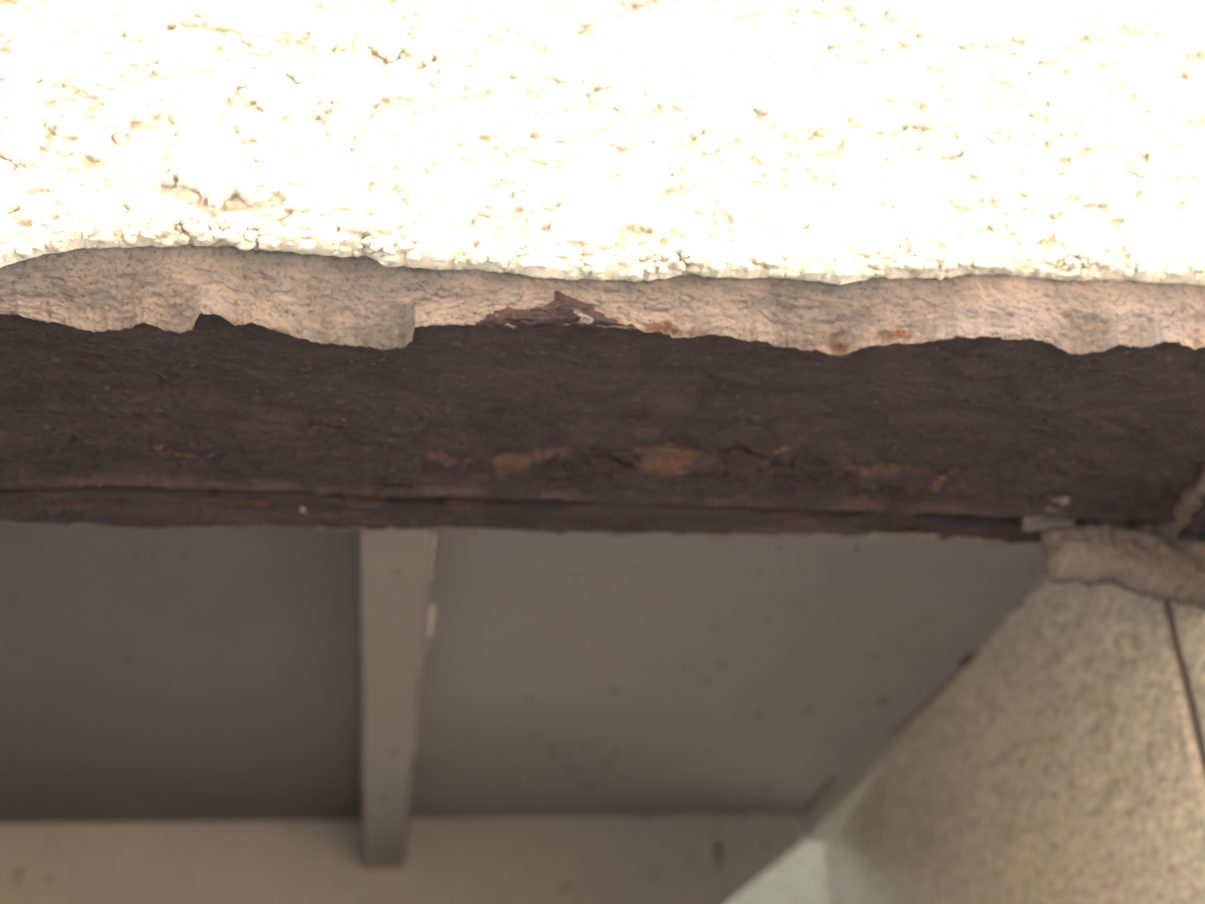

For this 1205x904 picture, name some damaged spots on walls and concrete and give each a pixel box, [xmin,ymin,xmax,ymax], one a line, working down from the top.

flaking render [0,244,1205,356]
corrosion [492,444,574,474]
corrosion [608,441,707,478]
peeling [834,495,1076,545]
corrosion [1159,465,1205,542]